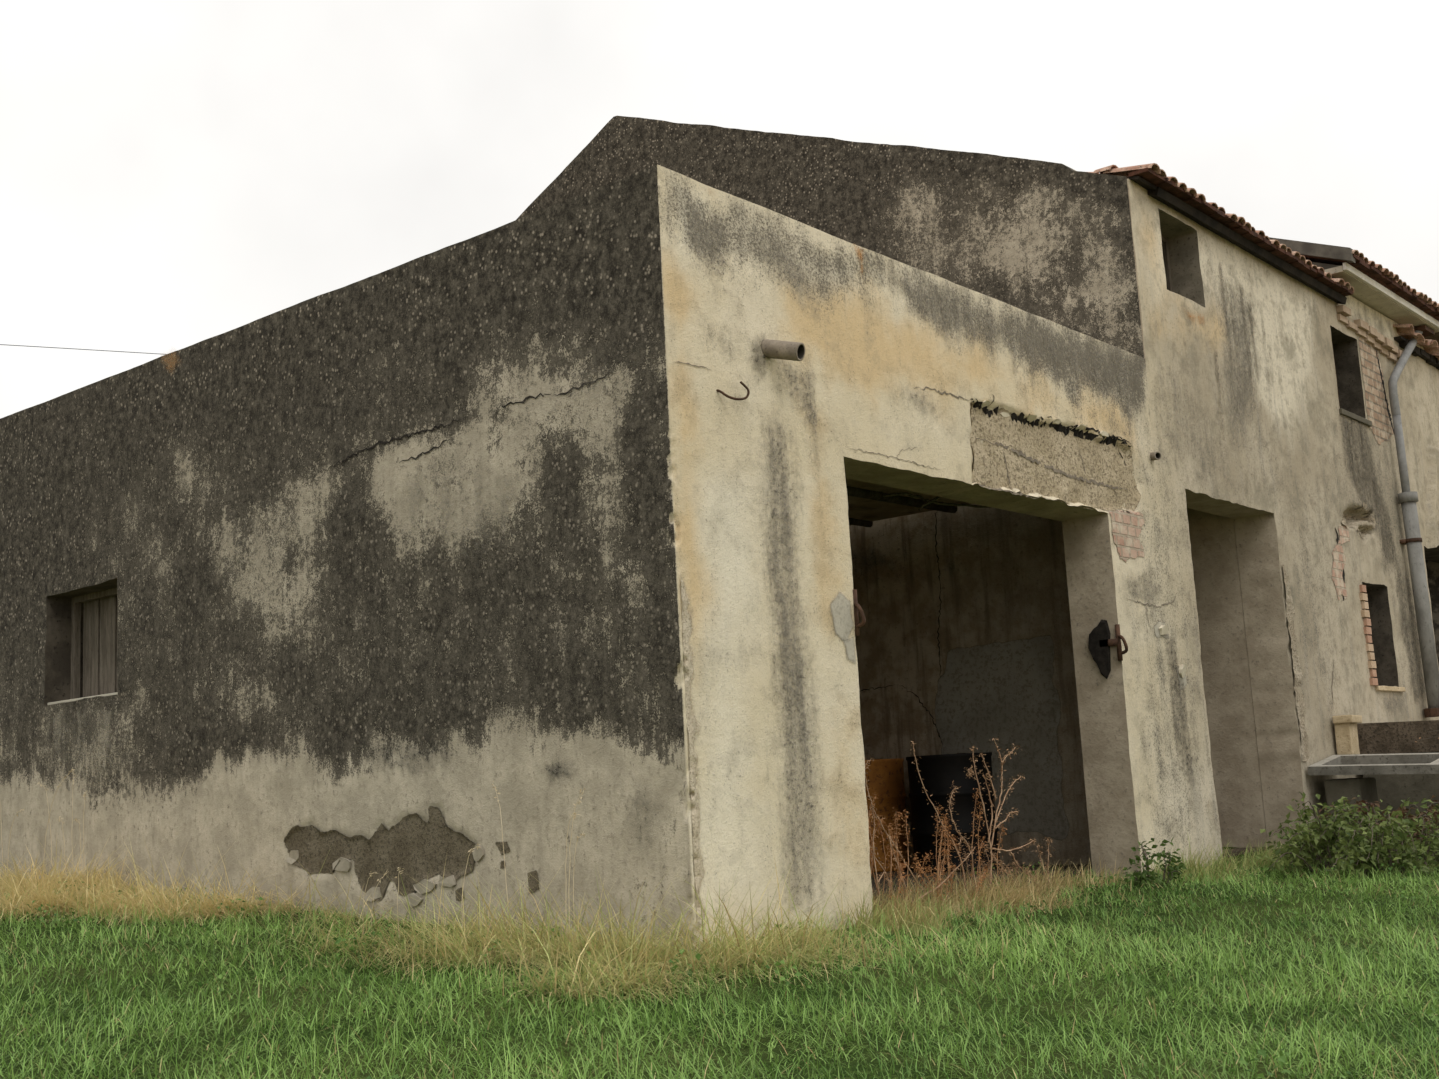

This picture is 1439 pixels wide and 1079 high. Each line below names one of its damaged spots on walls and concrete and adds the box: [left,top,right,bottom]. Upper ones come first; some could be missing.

crack [500,372,613,408]
flaking render [1359,337,1394,445]
spalling [1393,324,1439,370]
crack [322,416,468,472]
spalling [970,402,1145,562]
flaking render [1332,502,1376,601]
water stain [758,422,822,904]
peeling [831,592,856,663]
peeling [284,806,510,907]
peeling [527,870,539,893]